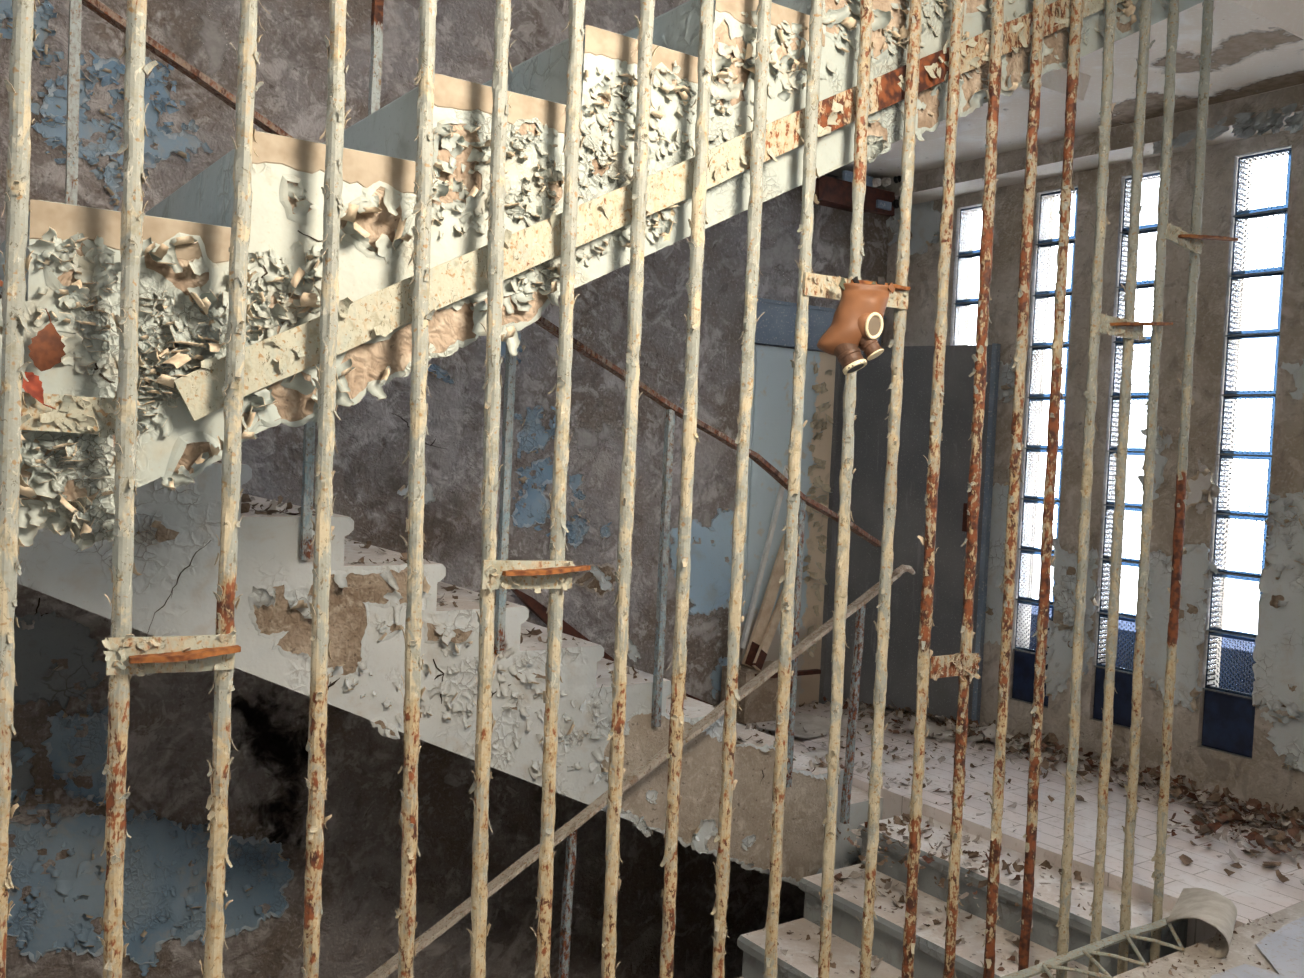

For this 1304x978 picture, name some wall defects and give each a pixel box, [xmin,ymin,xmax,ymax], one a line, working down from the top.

peeling [431,0,1033,239]
peeling [137,232,229,491]
peeling [336,321,412,407]
peeling [339,181,413,264]
peeling [428,199,687,385]
peeling [18,431,115,551]
peeling [7,611,108,963]
crack [146,540,211,636]
water stain [231,692,308,847]
peeling [327,563,827,885]
peeling [1252,490,1304,772]
peeling [123,808,210,976]